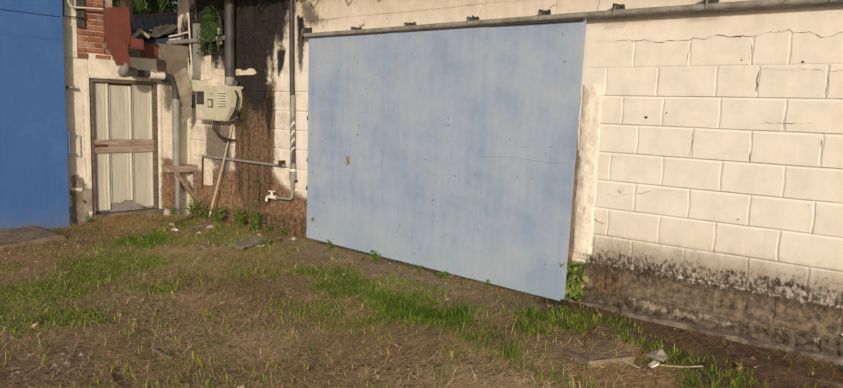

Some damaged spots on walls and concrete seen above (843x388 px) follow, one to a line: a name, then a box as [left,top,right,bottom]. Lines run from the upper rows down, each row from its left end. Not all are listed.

water stain [180,0,225,69]
peeling [204,55,225,80]
crack [596,29,841,90]
water stain [195,0,310,239]
water stain [575,253,843,357]